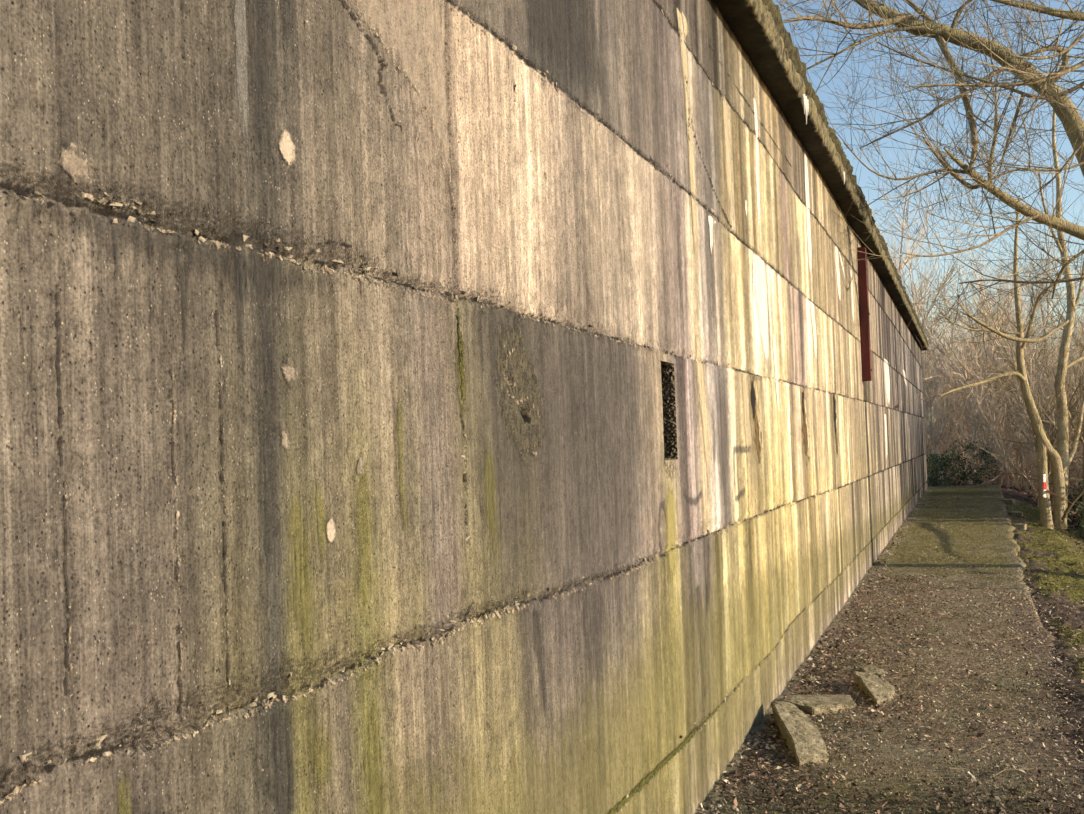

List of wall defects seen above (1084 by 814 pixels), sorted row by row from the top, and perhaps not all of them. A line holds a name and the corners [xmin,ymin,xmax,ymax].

damp [76,214,302,566]
damp [708,216,716,253]
damp [745,98,760,227]
damp [752,254,779,413]
damp [804,151,812,273]
damp [835,246,854,324]
damp [315,489,326,556]
damp [696,566,710,722]